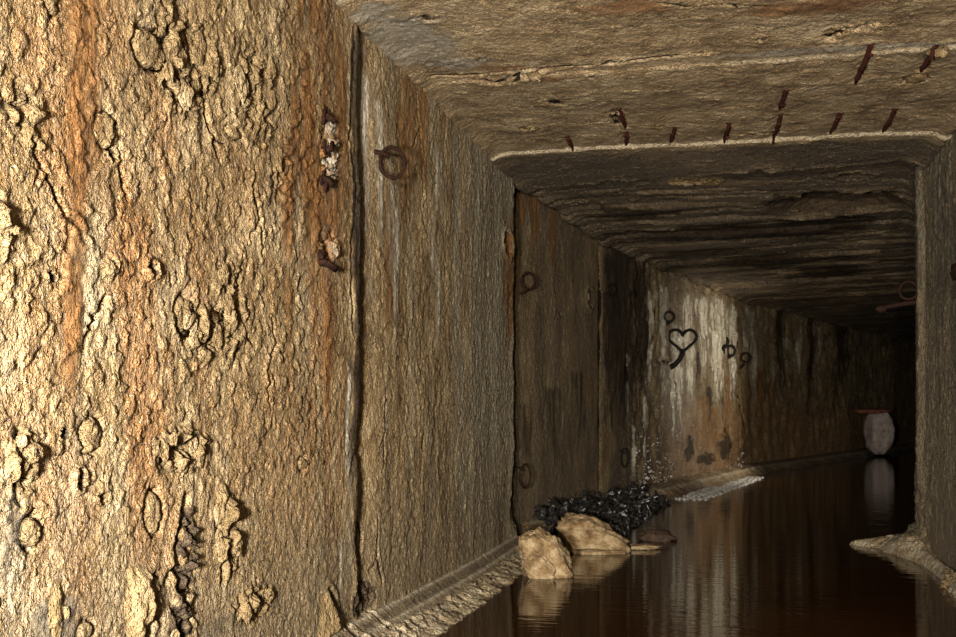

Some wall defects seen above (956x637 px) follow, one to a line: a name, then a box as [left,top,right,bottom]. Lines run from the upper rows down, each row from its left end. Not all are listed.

rust [854,43,874,84]
rust [920,45,938,72]
rust [67,0,98,252]
spalling [318,121,337,187]
rust [772,90,789,144]
rust [282,57,346,398]
rust [63,271,81,379]
leakage [590,209,878,473]
spalling [6,421,43,495]
spalling [61,414,102,454]
spalling [142,489,161,536]
spalling [168,507,199,637]